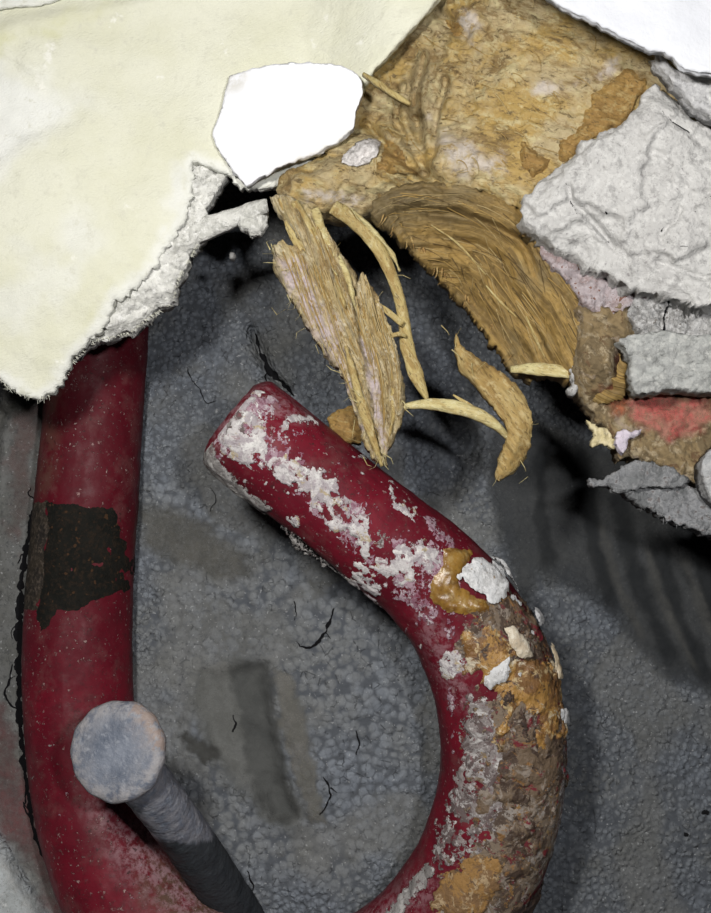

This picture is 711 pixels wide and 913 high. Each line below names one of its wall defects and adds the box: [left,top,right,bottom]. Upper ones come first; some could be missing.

flaking render [212,62,418,188]
peeling [520,68,647,179]
flaking render [586,460,711,540]
corrosion [430,592,569,913]